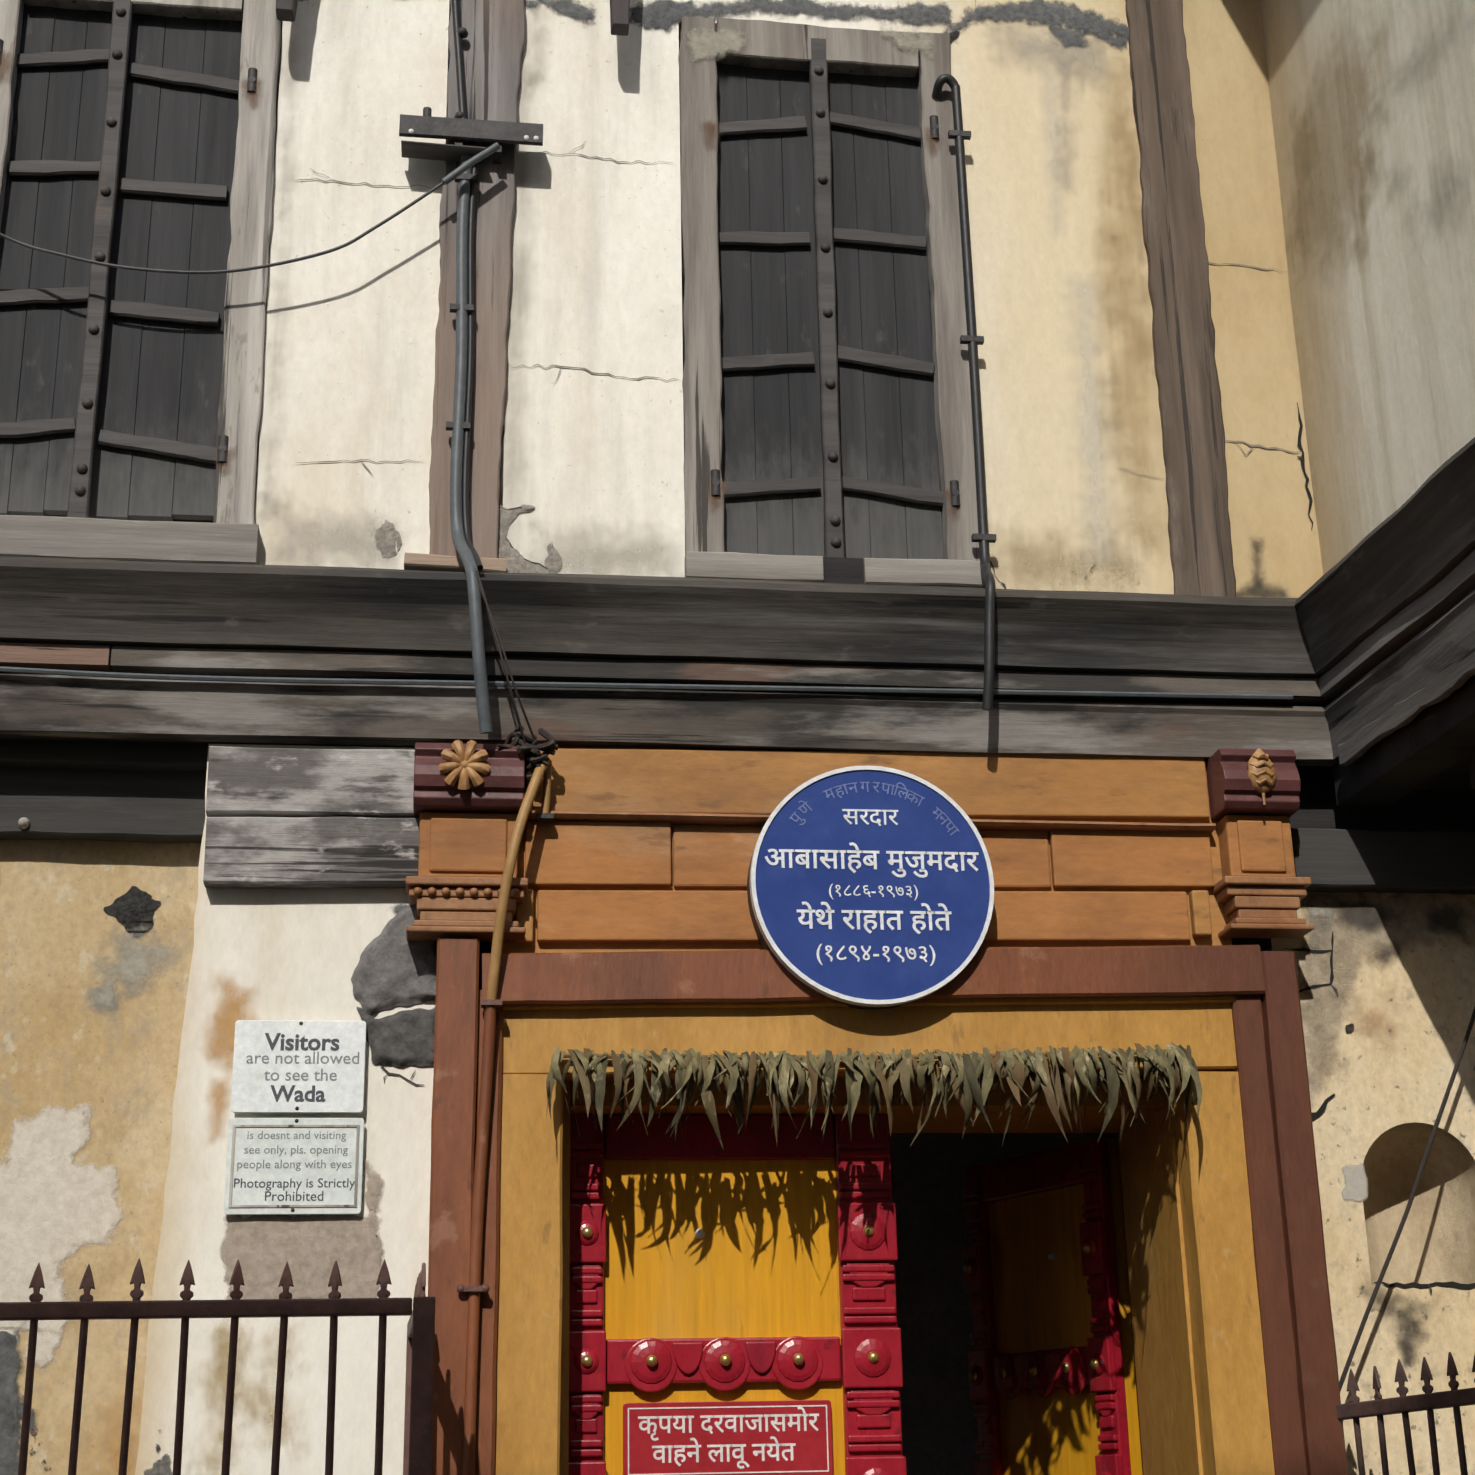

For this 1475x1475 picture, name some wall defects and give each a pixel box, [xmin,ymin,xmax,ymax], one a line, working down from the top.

crack [508,364,678,384]
crack [1225,402,1313,530]
peeling [497,505,562,574]
flaking render [104,886,161,938]
flaking render [351,903,437,1067]
crack [1284,932,1338,996]
water stain [211,988,245,1056]
water stain [215,1085,224,1117]
crack [1312,1094,1335,1121]
peeling [0,1104,123,1302]
peeling [0,1320,68,1367]
peeling [16,1403,51,1471]